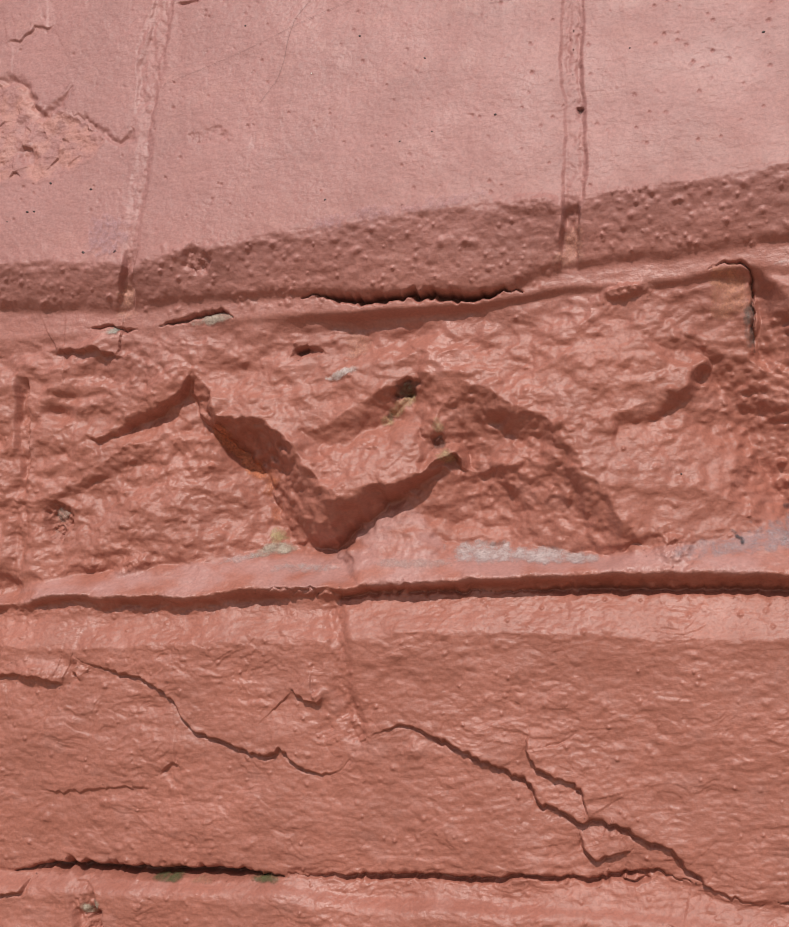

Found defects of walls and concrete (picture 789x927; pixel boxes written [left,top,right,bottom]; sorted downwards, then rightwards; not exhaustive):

peeling [0,71,139,186]
crack [49,306,237,363]
crack [298,283,526,309]
crack [706,257,760,357]
crack [0,653,789,911]